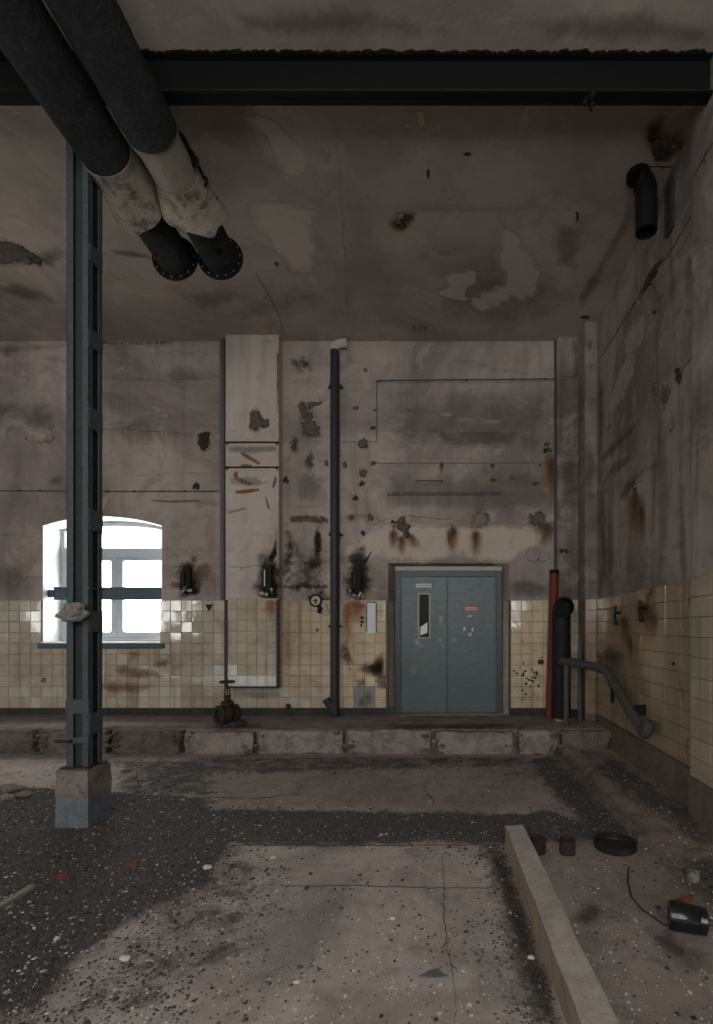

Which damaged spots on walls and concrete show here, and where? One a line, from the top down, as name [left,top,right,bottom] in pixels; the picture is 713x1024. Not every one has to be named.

peeling [439,229,540,311]
spalling [249,409,269,431]
spalling [298,401,322,436]
spalling [197,432,212,451]
corrosion [390,531,415,550]
peeling [343,510,545,578]
crack [234,844,497,1024]